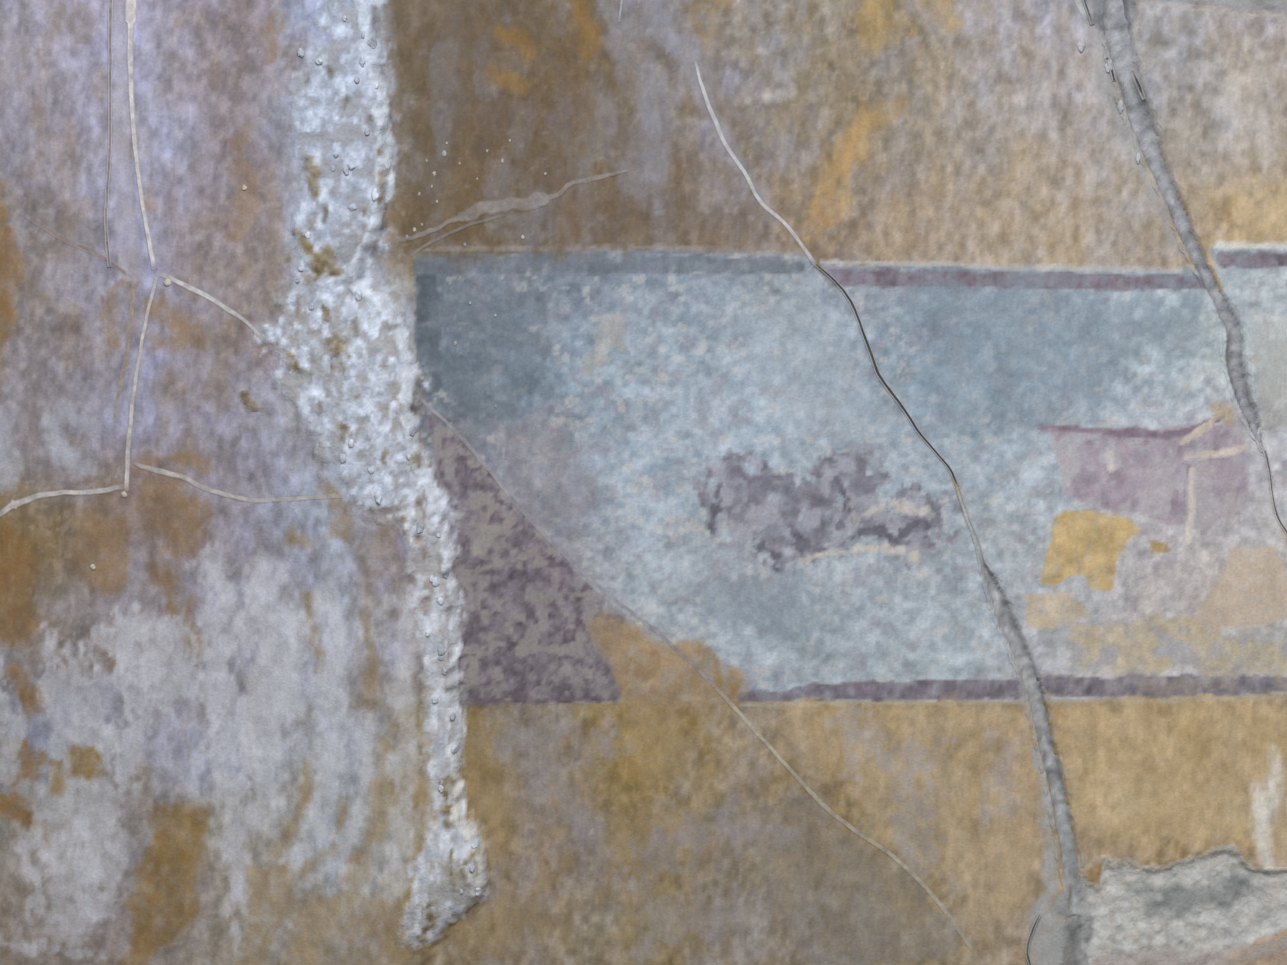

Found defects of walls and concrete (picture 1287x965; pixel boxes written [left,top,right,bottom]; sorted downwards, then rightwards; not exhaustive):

crack [0,212,343,517]
water stain [0,0,781,965]
crack [416,395,975,965]
water stain [743,86,799,107]
crack [641,0,1098,965]
crack [1072,0,1287,536]